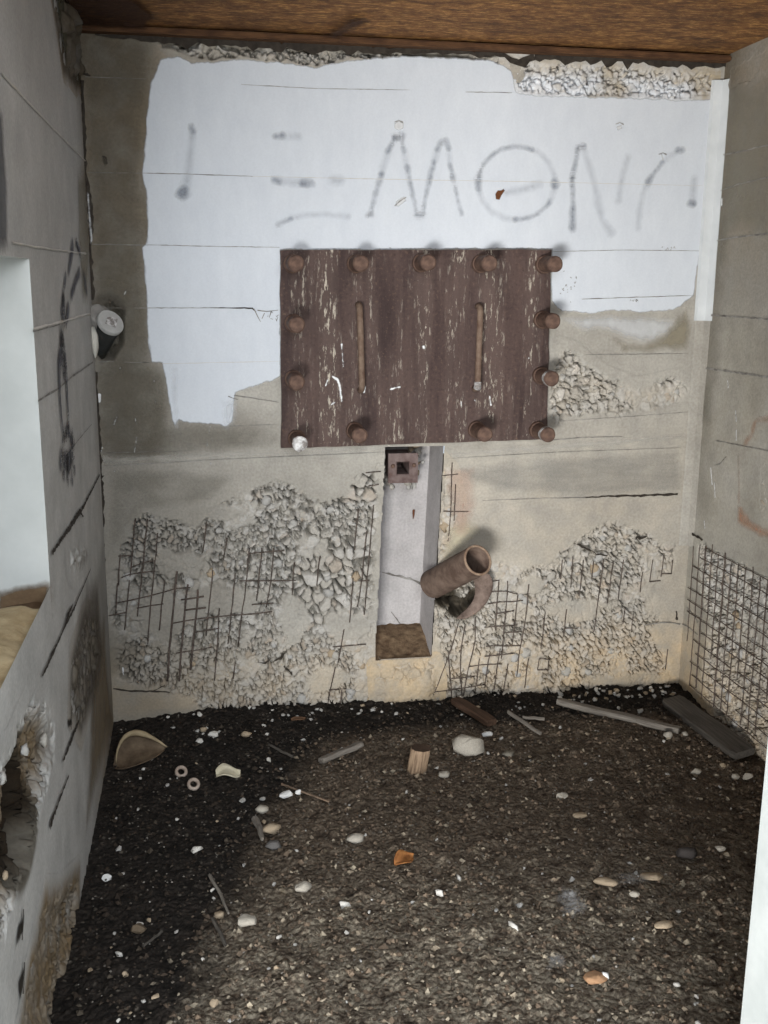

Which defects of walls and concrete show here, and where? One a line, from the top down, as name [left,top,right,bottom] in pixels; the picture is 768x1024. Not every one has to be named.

spalling [154,37,768,101]
spalling [440,463,468,541]
crack [483,493,678,501]
spalling [109,518,296,681]
spalling [271,505,409,722]
spalling [419,580,571,710]
spalling [560,544,636,641]
spalling [687,544,768,749]
spalling [0,668,82,1024]